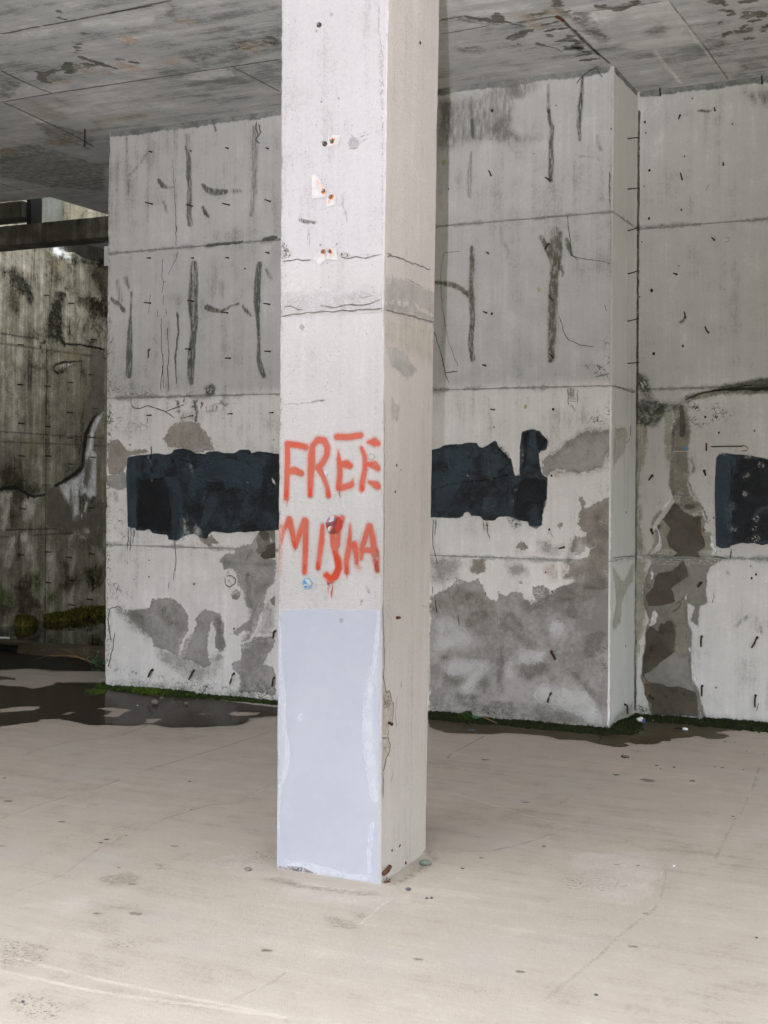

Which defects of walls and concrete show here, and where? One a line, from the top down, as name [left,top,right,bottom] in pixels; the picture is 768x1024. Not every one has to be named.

crack [282,244,309,262]
crack [341,253,430,287]
crack [0,413,102,500]
water stain [0,349,150,564]
water stain [47,552,121,594]
peeling [107,597,226,679]
spalling [379,687,393,769]